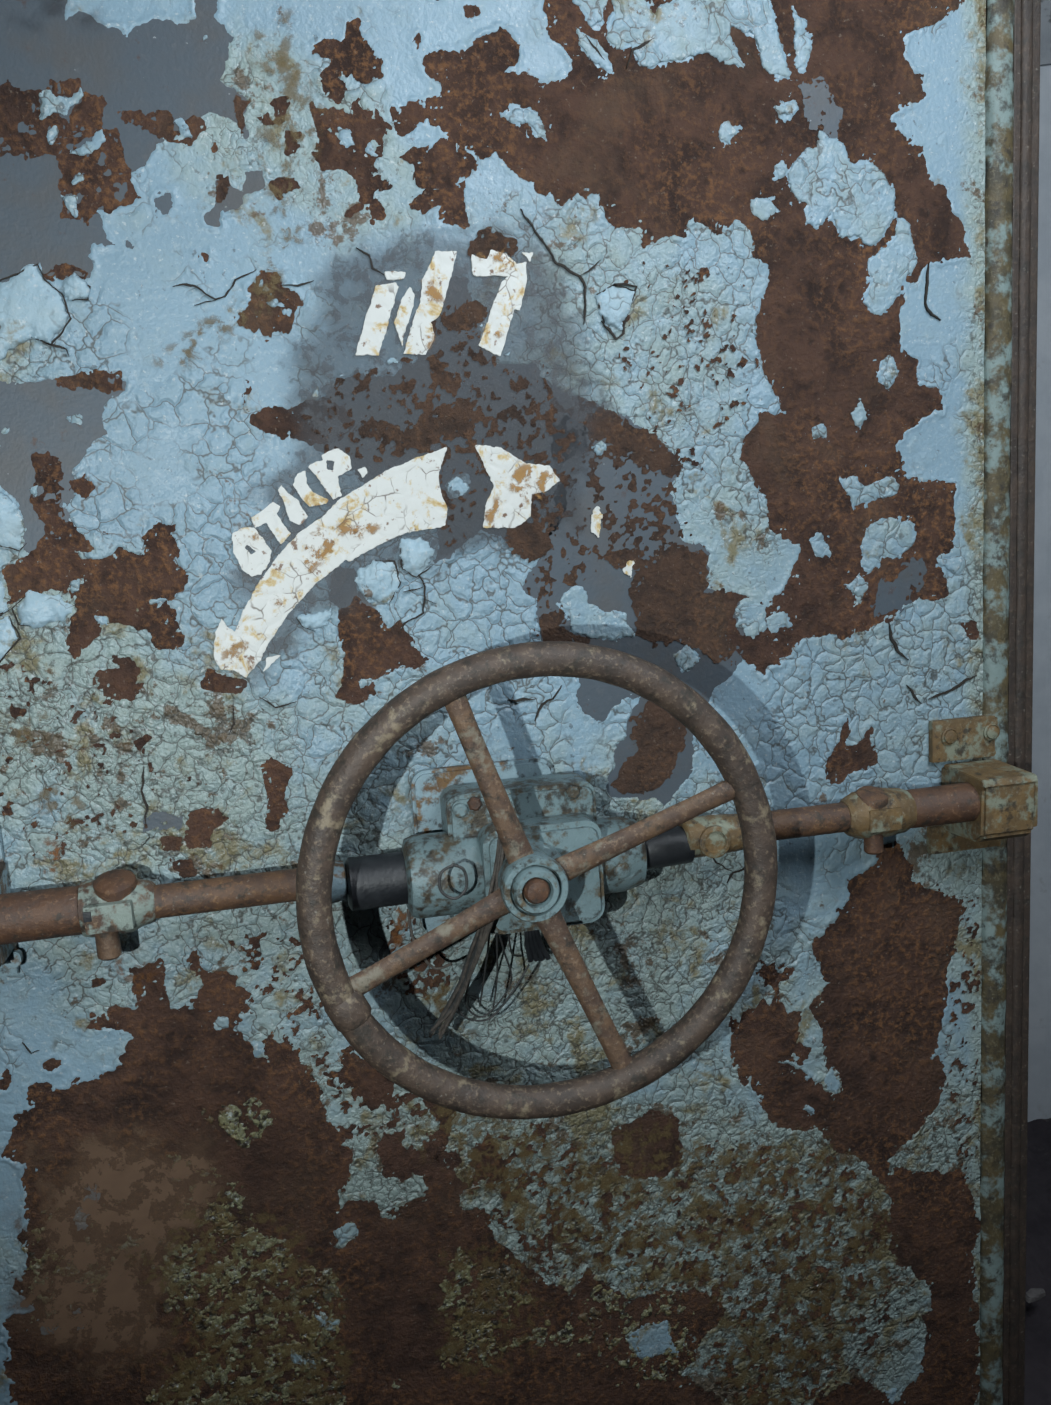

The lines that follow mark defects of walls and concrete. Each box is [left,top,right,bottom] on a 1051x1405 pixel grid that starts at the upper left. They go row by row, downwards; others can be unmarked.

corrosion [0,78,218,226]
peeling [0,0,249,361]
crack [520,209,637,340]
corrosion [233,0,971,675]
peeling [0,376,126,553]
peeling [296,276,745,702]
crack [140,766,149,846]
corrosion [335,596,429,705]
crack [399,574,436,635]
crack [508,685,562,721]
peeling [575,677,695,805]
corrosion [0,841,981,1405]